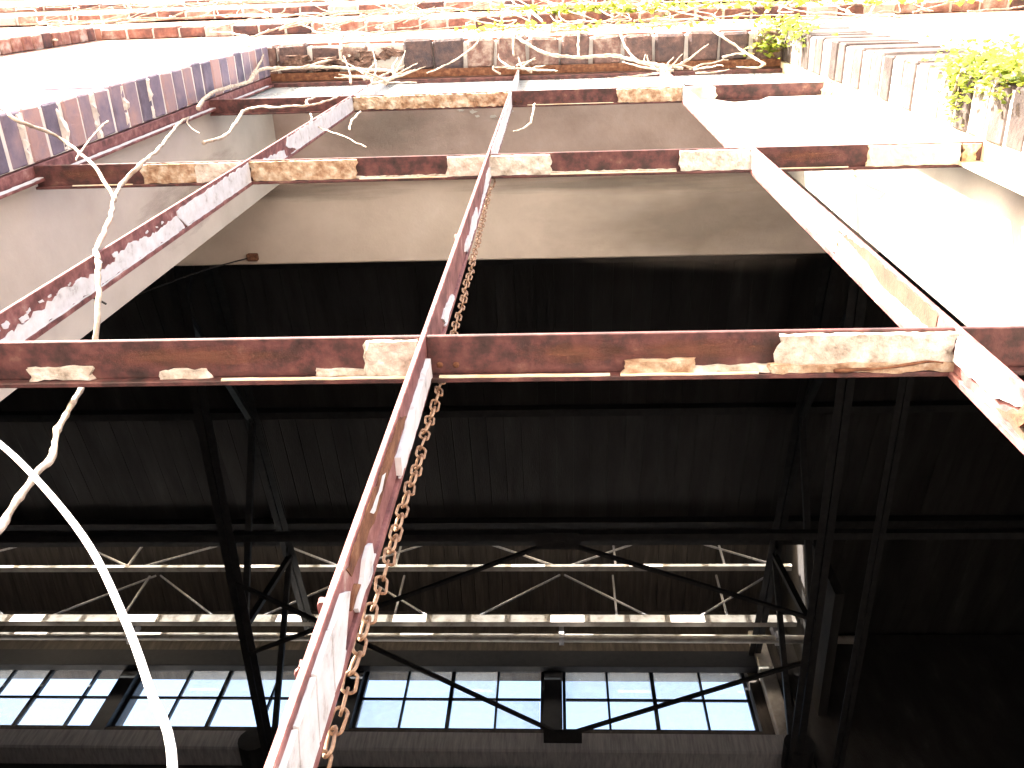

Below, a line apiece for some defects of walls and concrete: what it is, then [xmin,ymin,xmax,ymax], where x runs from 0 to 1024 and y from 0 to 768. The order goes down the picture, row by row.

peeling [0,70,1024,514]
corrosion [346,416,407,611]
peeling [279,543,376,768]